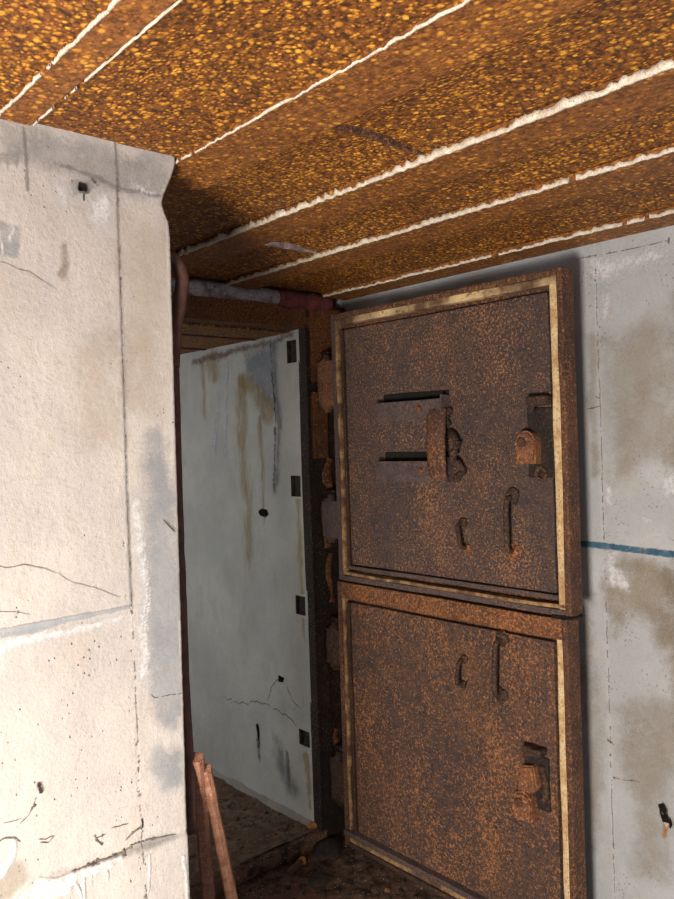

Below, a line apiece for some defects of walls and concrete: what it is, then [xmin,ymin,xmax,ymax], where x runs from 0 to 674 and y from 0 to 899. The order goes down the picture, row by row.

crack [0,564,118,597]
water stain [604,550,674,646]
crack [227,679,297,723]
water stain [0,841,17,879]
water stain [27,855,123,899]